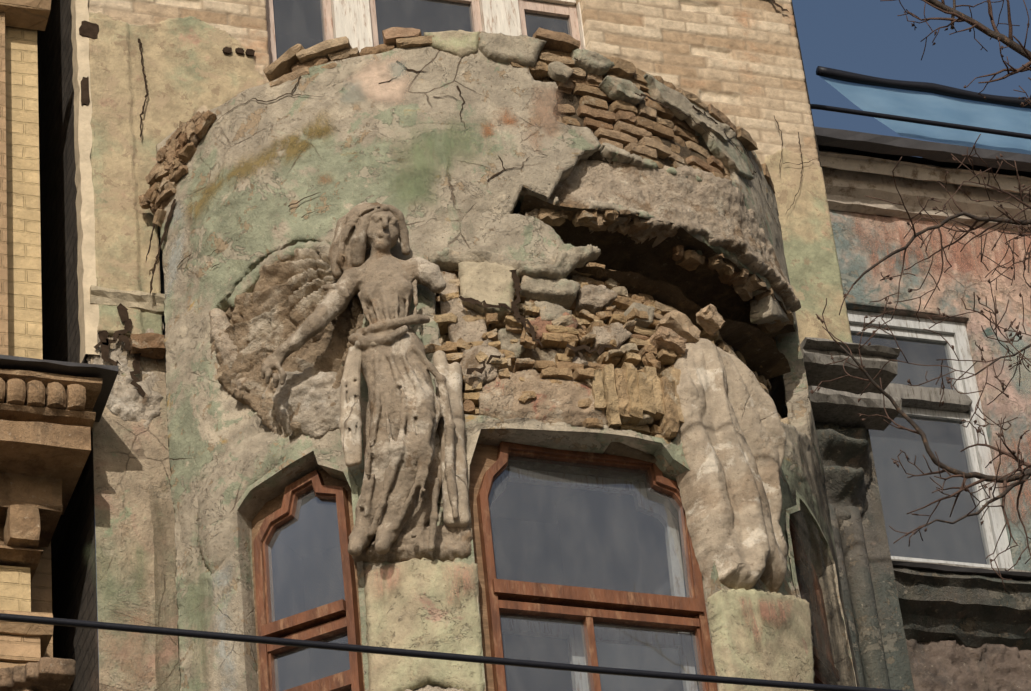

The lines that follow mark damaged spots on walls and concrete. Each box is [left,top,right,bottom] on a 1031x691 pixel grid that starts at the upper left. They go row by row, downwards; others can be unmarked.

crack [138,38,149,137]
crack [379,60,428,84]
crack [433,86,465,127]
spalling [424,30,754,180]
flaking render [138,110,217,228]
crack [488,157,529,181]
spalling [428,195,796,380]